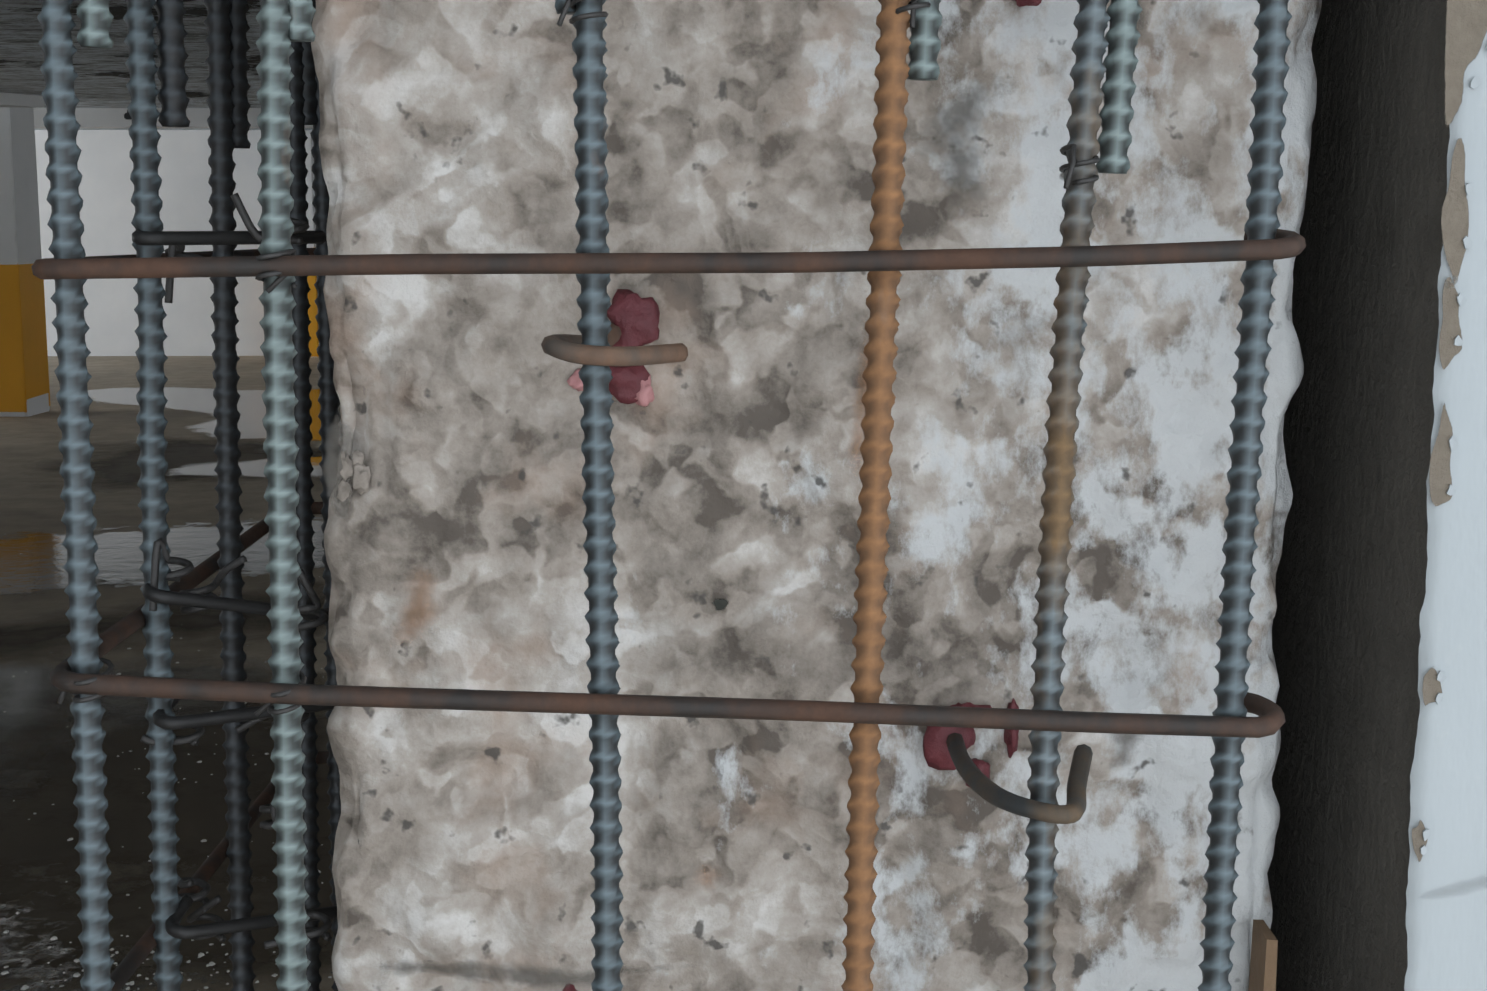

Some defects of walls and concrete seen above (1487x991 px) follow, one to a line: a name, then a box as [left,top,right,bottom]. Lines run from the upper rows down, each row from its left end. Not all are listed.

water stain [936,93,979,192]
peeling [1439,0,1487,369]
spalling [326,420,371,517]
spalling [1429,403,1457,506]
spalling [713,599,728,610]
water stain [397,963,595,986]